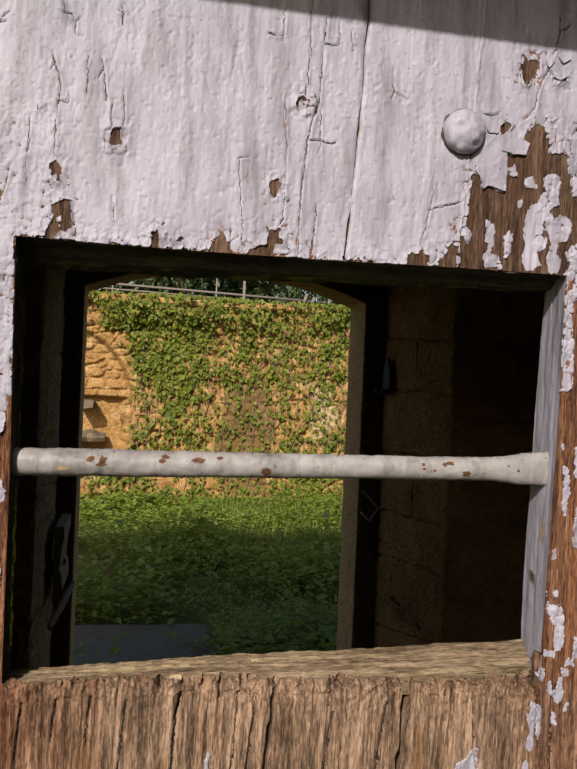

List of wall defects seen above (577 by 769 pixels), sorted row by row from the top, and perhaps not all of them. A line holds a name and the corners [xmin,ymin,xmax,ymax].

peeling [519,58,540,86]
peeling [109,128,122,145]
peeling [49,161,62,182]
peeling [269,179,281,198]
peeling [406,115,577,275]
peeling [44,198,74,239]
peeling [150,230,160,248]
peeling [209,232,231,253]
peeling [244,226,283,256]
rust [86,456,107,466]
peeling [0,300,577,769]